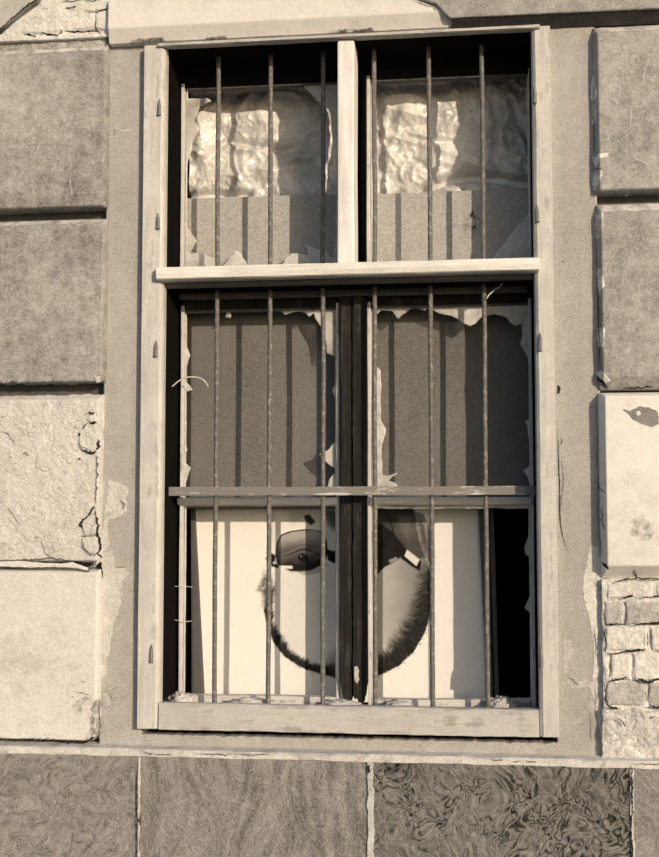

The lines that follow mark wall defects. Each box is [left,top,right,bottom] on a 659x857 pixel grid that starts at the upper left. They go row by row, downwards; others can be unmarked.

flaking render [0,0,109,44]
peeling [0,412,129,680]
flaking render [562,405,659,758]
spalling [0,691,113,744]